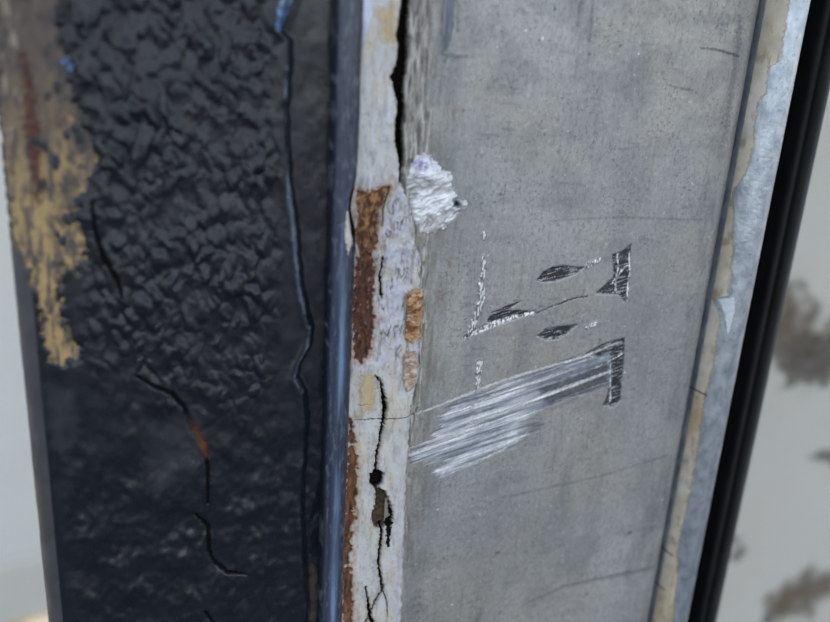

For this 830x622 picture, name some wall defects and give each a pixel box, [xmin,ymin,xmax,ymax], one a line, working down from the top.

peeling [0,0,99,367]
crack [135,375,246,575]
rust [342,418,359,622]
rust [352,186,390,364]
crack [364,520,388,622]
crack [377,256,385,298]
crack [364,376,414,468]
crack [381,0,408,226]
rust [402,288,424,392]
peeling [653,0,790,622]